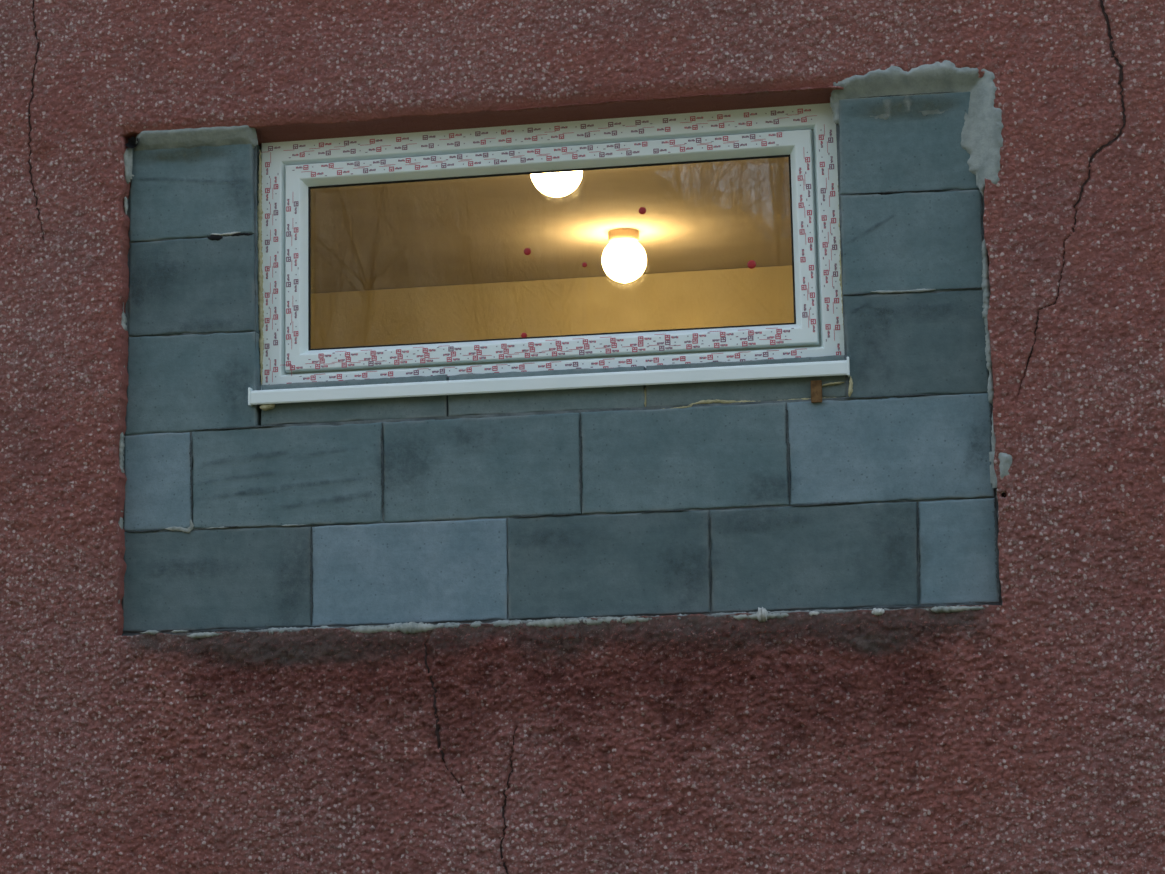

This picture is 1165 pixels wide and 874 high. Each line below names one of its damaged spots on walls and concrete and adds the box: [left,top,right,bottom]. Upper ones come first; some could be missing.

crack [28,0,44,240]
crack [1019,0,1126,392]
crack [424,639,464,793]
crack [500,726,518,874]